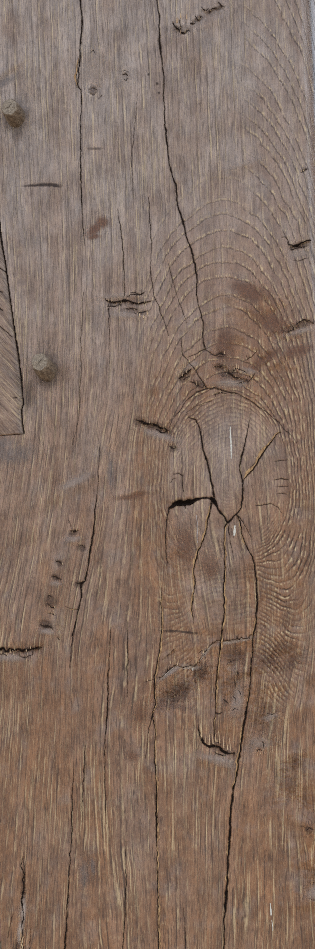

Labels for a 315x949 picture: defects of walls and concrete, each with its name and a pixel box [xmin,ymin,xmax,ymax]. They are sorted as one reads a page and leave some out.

crack [0,647,39,658]
crack [64,0,297,949]